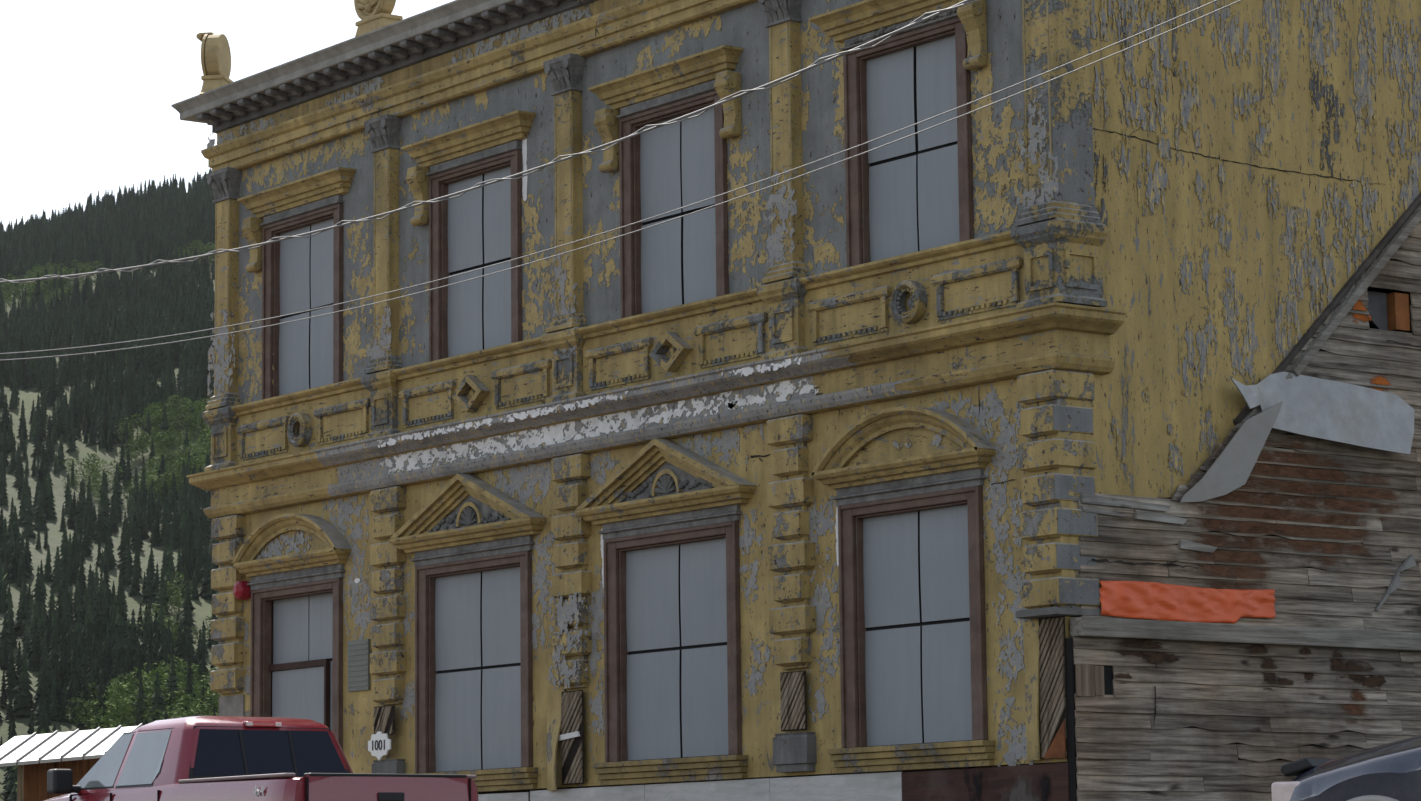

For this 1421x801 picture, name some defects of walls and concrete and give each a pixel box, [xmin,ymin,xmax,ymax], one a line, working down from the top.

peeling [239,131,370,195]
peeling [727,124,841,289]
peeling [800,0,845,148]
peeling [970,53,1059,233]
crack [1093,127,1385,185]
peeling [1089,0,1421,478]
peeling [207,259,274,404]
peeling [256,531,312,560]
peeling [310,346,1068,785]